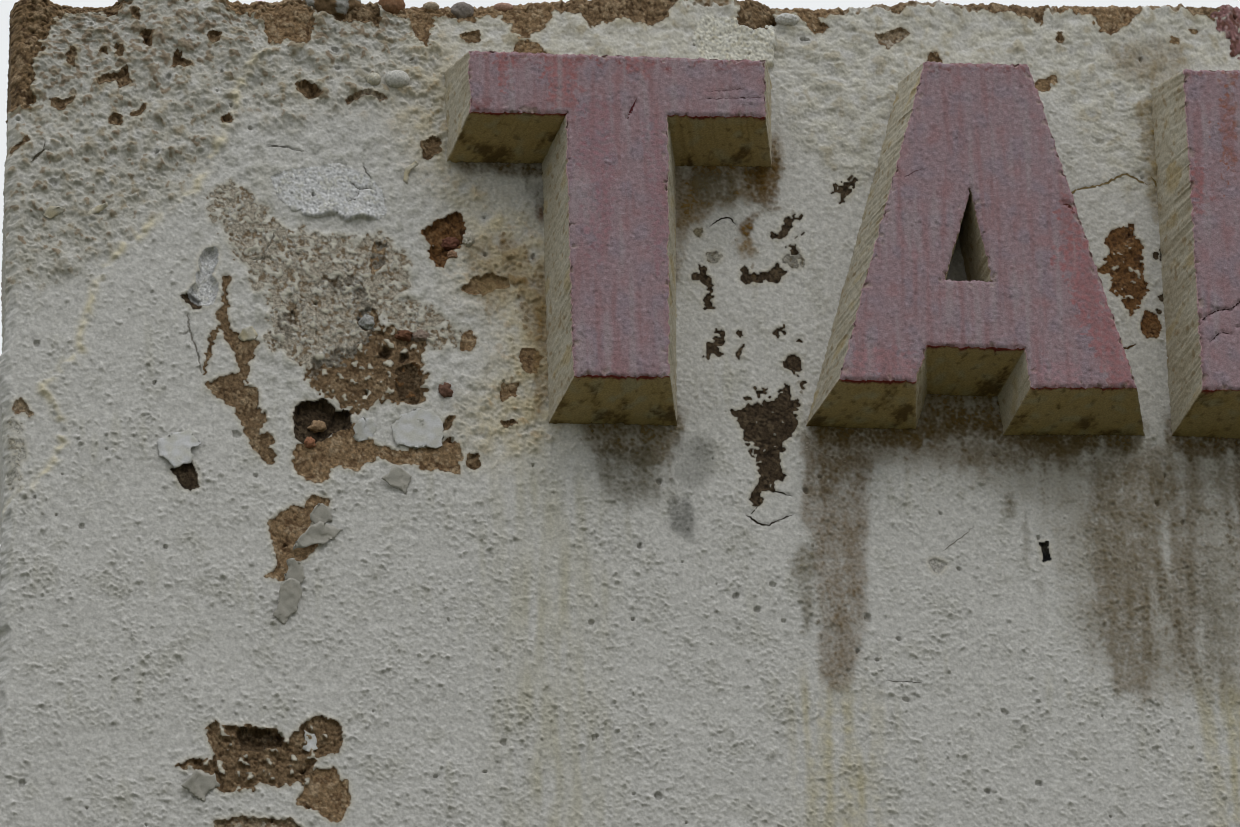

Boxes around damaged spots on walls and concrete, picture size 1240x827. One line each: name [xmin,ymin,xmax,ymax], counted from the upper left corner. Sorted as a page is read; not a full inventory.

flaking render [226,0,318,44]
flaking render [333,0,677,54]
flaking render [736,0,845,34]
flaking render [950,2,1142,35]
peeling [740,214,805,284]
peeling [1095,223,1164,338]
peeling [703,328,745,360]
peeling [180,163,481,624]
peeling [730,324,807,506]
peeling [157,428,201,491]
leakage [796,426,875,683]
flaking render [175,715,351,827]